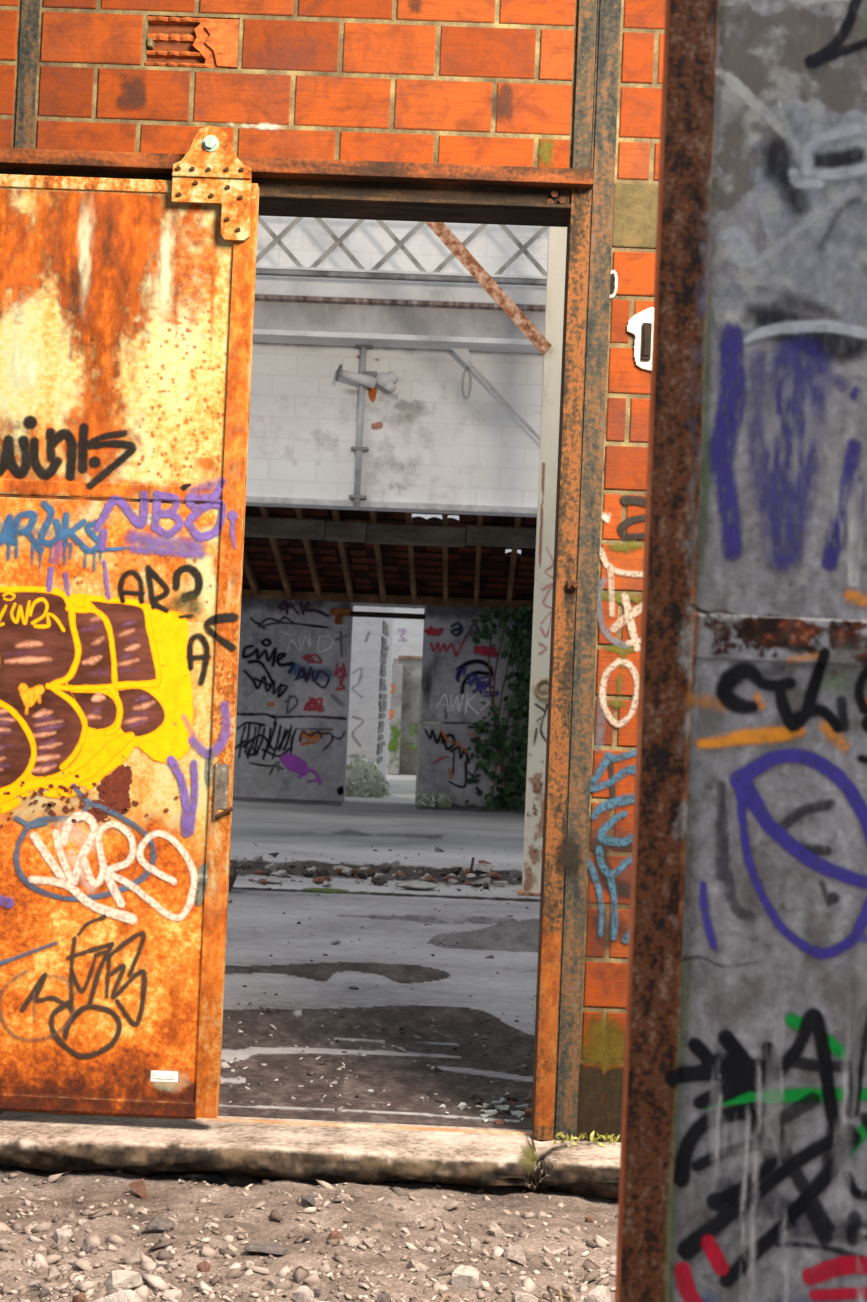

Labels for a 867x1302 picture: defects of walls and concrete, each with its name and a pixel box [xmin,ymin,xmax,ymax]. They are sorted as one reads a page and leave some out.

corrosion [0,187,257,622]
corrosion [686,537,867,712]
corrosion [0,790,226,1119]